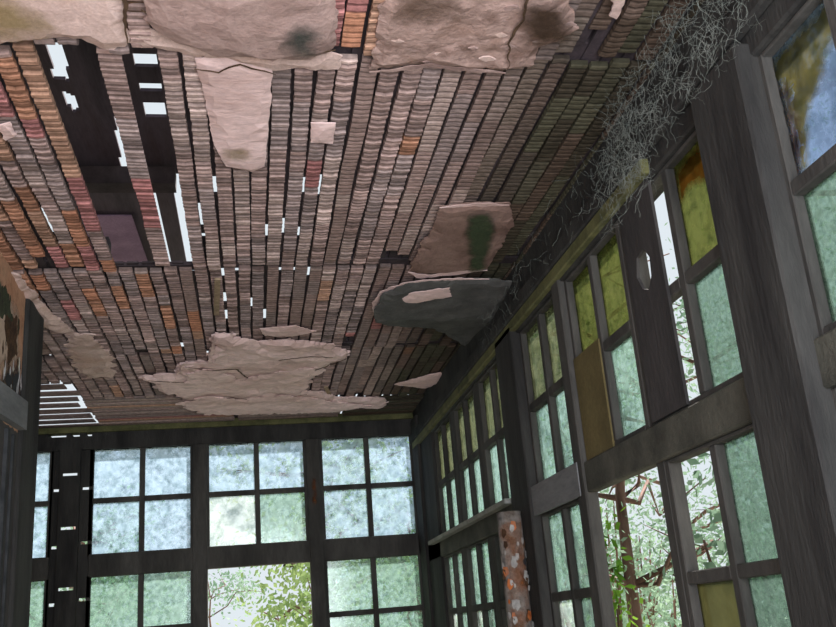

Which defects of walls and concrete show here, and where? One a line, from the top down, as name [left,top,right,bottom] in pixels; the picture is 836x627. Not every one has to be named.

crack [122,0,147,44]
leakage [287,30,313,55]
crack [507,0,529,70]
peeling [609,0,625,19]
leakage [466,215,494,272]
spalling [372,270,489,312]
peeling [0,282,22,395]